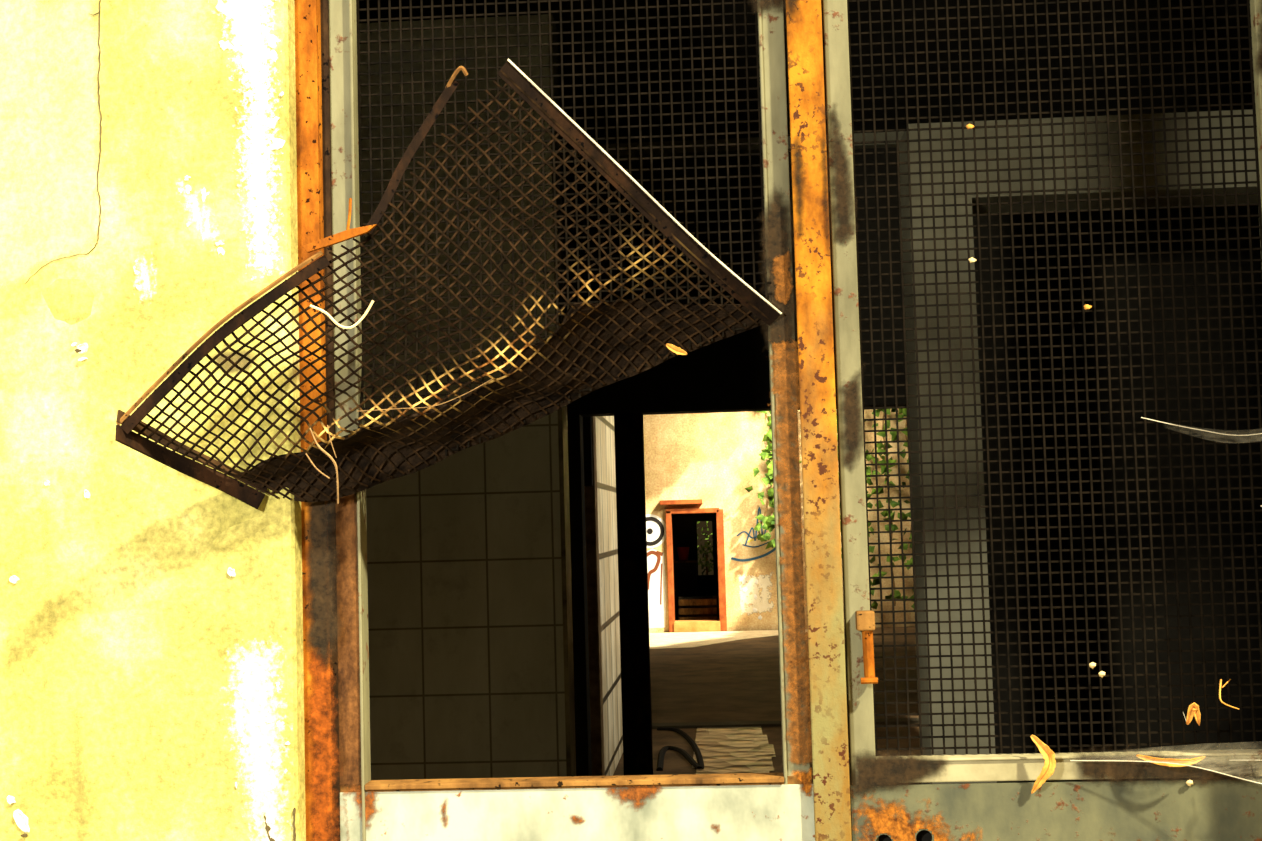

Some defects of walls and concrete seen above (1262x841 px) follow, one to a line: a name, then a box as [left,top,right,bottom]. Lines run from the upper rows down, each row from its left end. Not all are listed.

crack [27,0,102,282]
peeling [214,0,285,280]
peeling [224,641,293,841]
rust [309,651,338,841]